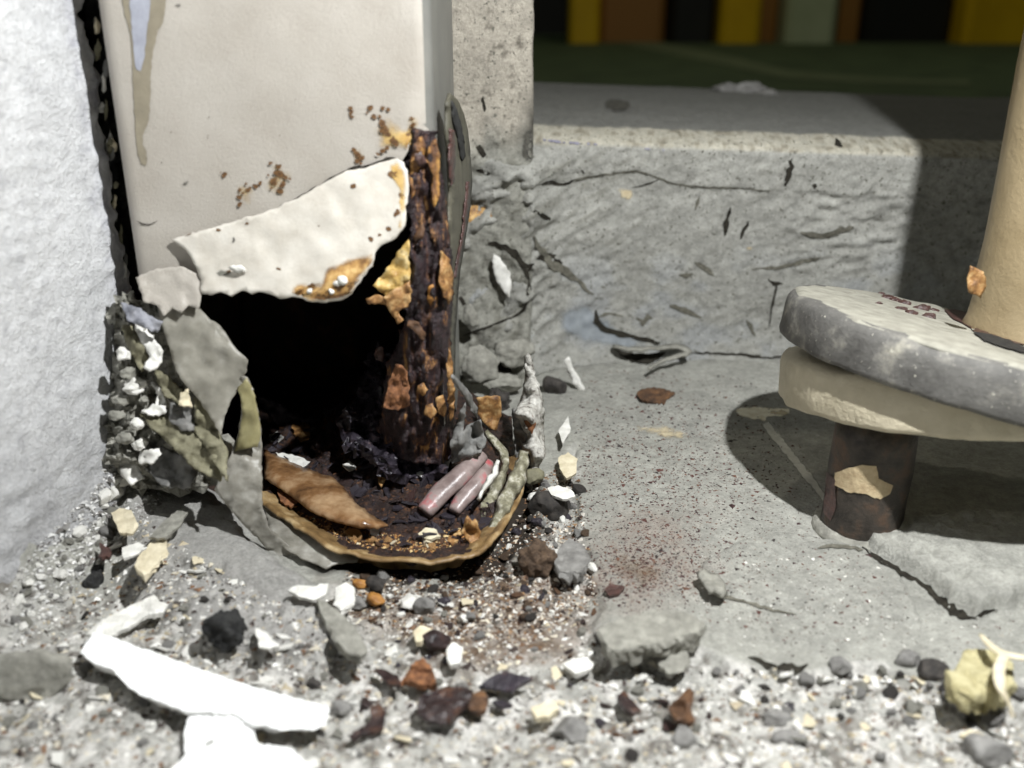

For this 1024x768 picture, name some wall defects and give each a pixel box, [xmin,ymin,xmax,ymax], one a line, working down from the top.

rust [237,162,291,207]
flaking render [476,145,490,176]
crack [541,168,768,191]
peeling [172,158,409,303]
rust [348,105,492,466]
crack [463,241,534,336]
peeling [492,254,512,298]
crack [692,351,781,359]
peeling [98,506,188,561]
crack [818,544,997,620]